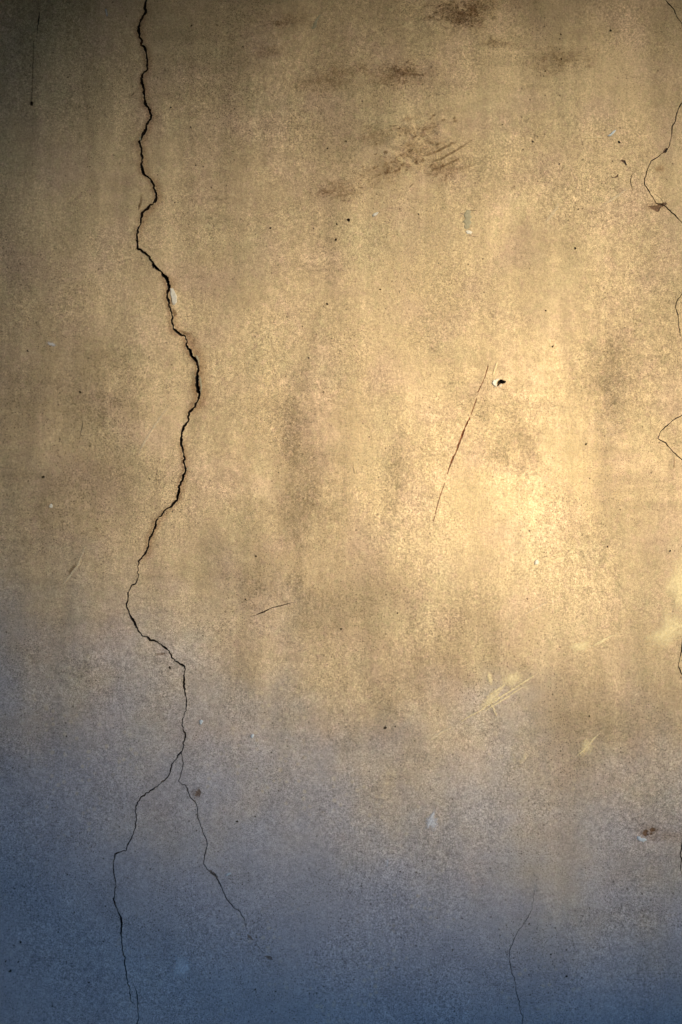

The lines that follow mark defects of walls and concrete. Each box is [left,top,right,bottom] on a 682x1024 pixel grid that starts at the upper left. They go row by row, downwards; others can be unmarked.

crack [630,103,682,222]
crack [658,415,682,460]
crack [113,0,263,1024]